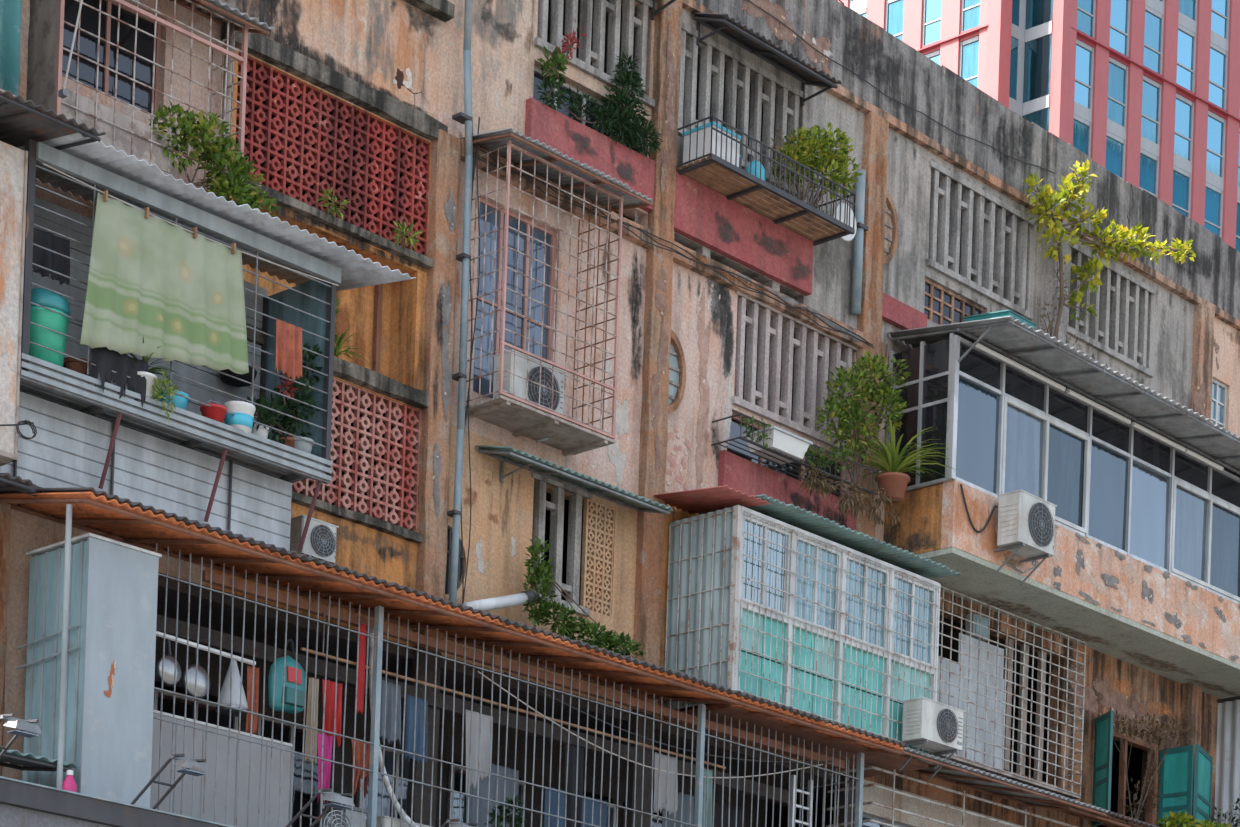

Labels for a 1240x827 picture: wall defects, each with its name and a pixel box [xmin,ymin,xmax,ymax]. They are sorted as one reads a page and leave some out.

water stain [236,0,433,112]
water stain [812,17,906,101]
water stain [982,105,1031,173]
water stain [1168,233,1220,278]
peeling [1053,532,1170,613]
peeling [1142,581,1207,648]
peeling [1214,596,1226,623]